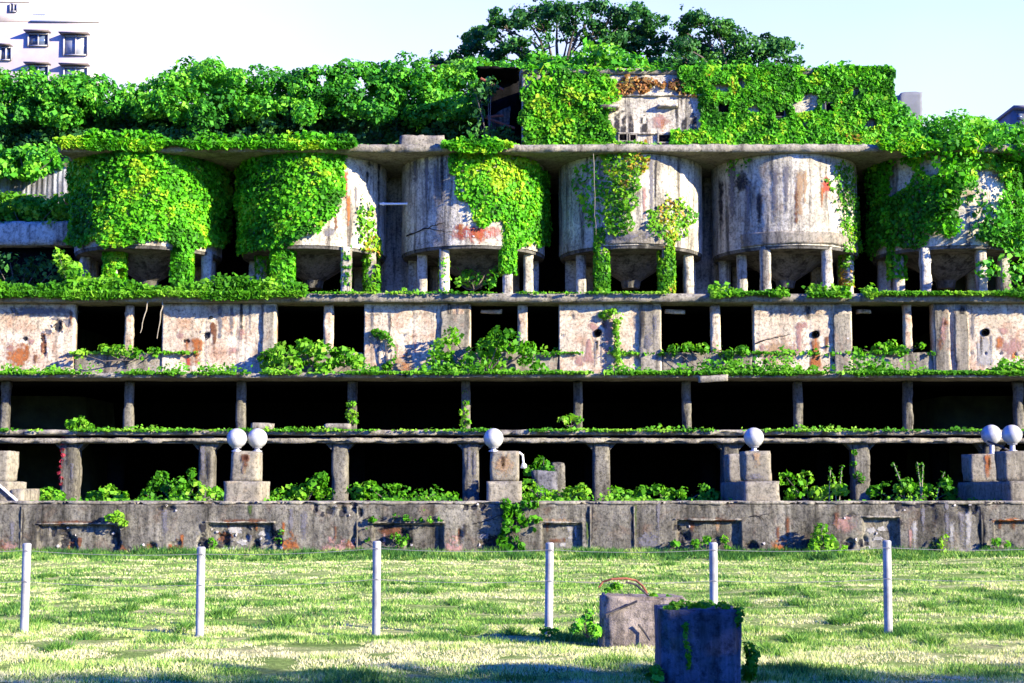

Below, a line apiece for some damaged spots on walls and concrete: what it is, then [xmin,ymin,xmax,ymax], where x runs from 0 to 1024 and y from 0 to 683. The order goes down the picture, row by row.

water stain [718,166,790,230]
rust [795,171,807,223]
rust [452,224,500,242]
rust [6,339,37,367]
rust [177,332,203,366]
rust [760,322,828,367]
rust [834,513,856,531]